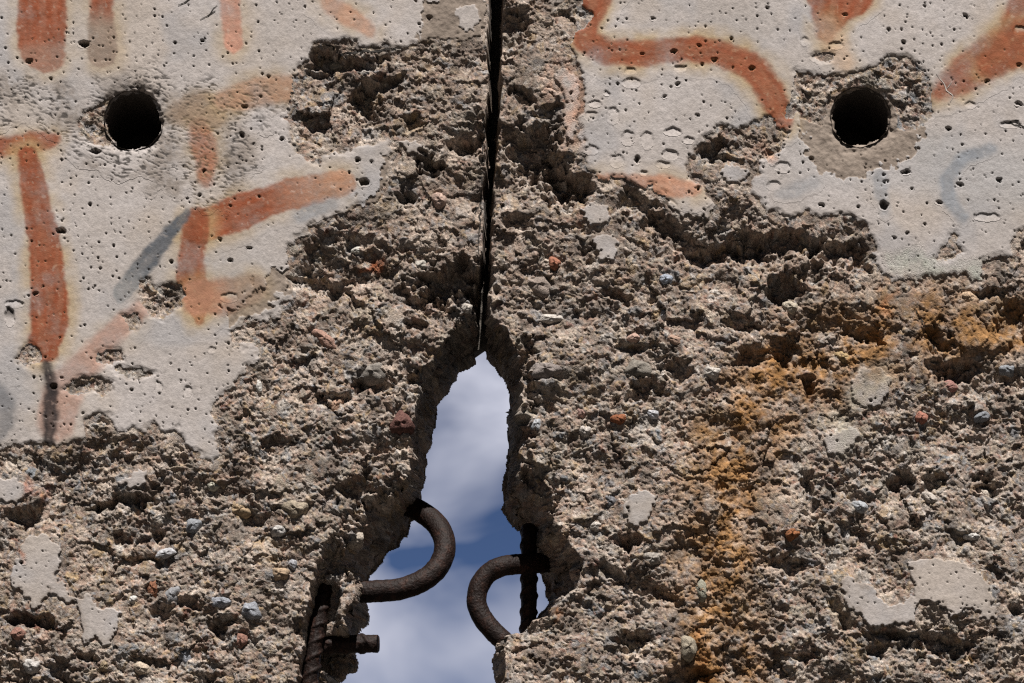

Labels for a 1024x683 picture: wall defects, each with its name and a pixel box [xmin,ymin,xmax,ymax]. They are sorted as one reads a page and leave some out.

peeling [1012,25,1024,36]
spalling [785,55,934,181]
peeling [999,121,1022,129]
crack [473,117,485,263]
spalling [936,232,963,261]
peeling [973,212,1002,222]
spalling [980,228,1024,296]
spalling [962,291,977,302]
spalling [0,0,493,683]
spalling [483,0,881,683]
spalling [722,359,1024,683]